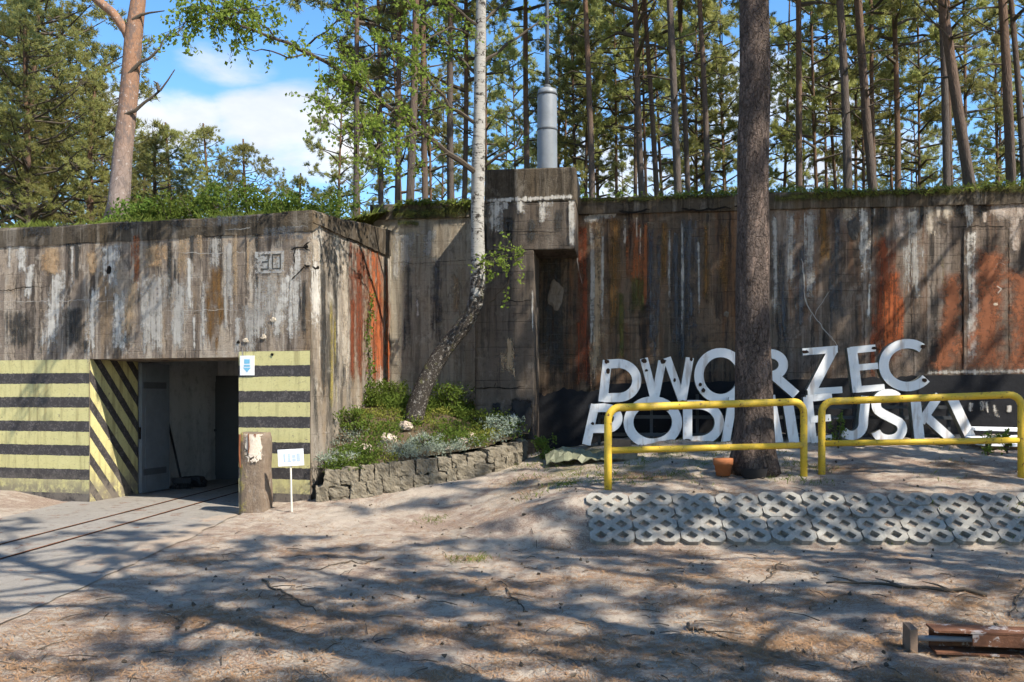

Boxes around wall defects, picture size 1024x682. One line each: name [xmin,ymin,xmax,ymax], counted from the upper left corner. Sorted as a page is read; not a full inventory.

leakage [8,224,70,297]
leakage [6,243,137,359]
leakage [167,215,348,397]
rust [349,244,390,382]
rust [576,227,592,385]
leakage [487,195,700,378]
leakage [772,211,817,346]
rust [870,237,904,375]
rust [931,250,1024,375]